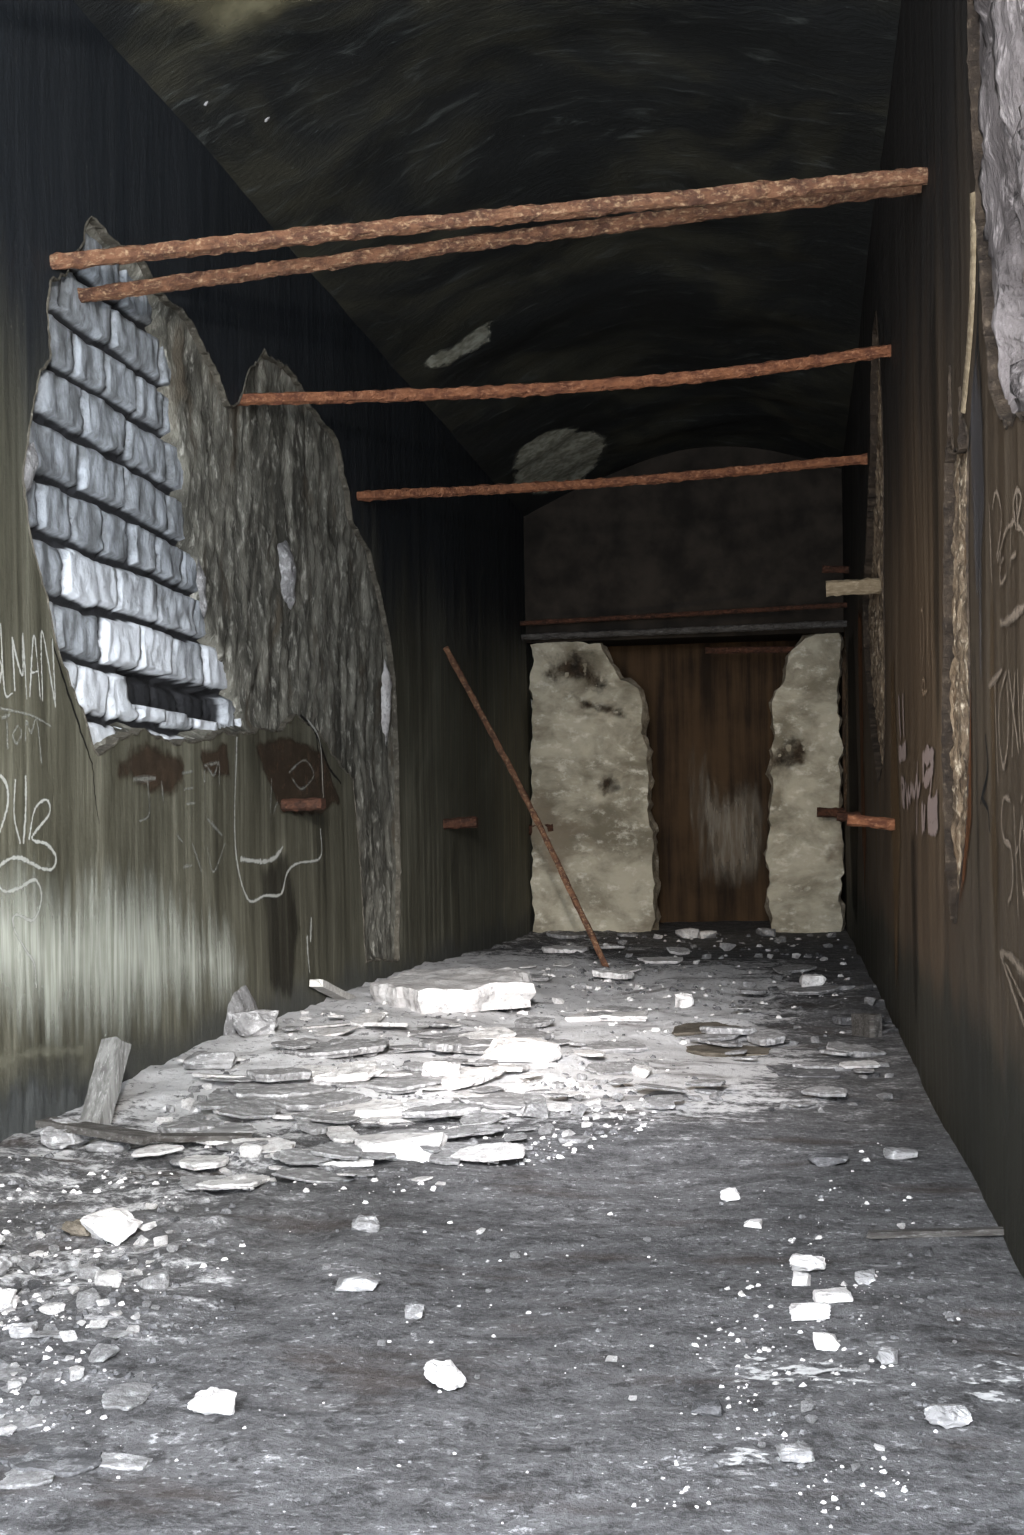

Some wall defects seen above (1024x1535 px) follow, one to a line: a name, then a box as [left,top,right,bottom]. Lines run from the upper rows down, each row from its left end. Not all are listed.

spalling [22,216,402,963]
spalling [763,311,886,931]
spalling [941,0,1024,924]